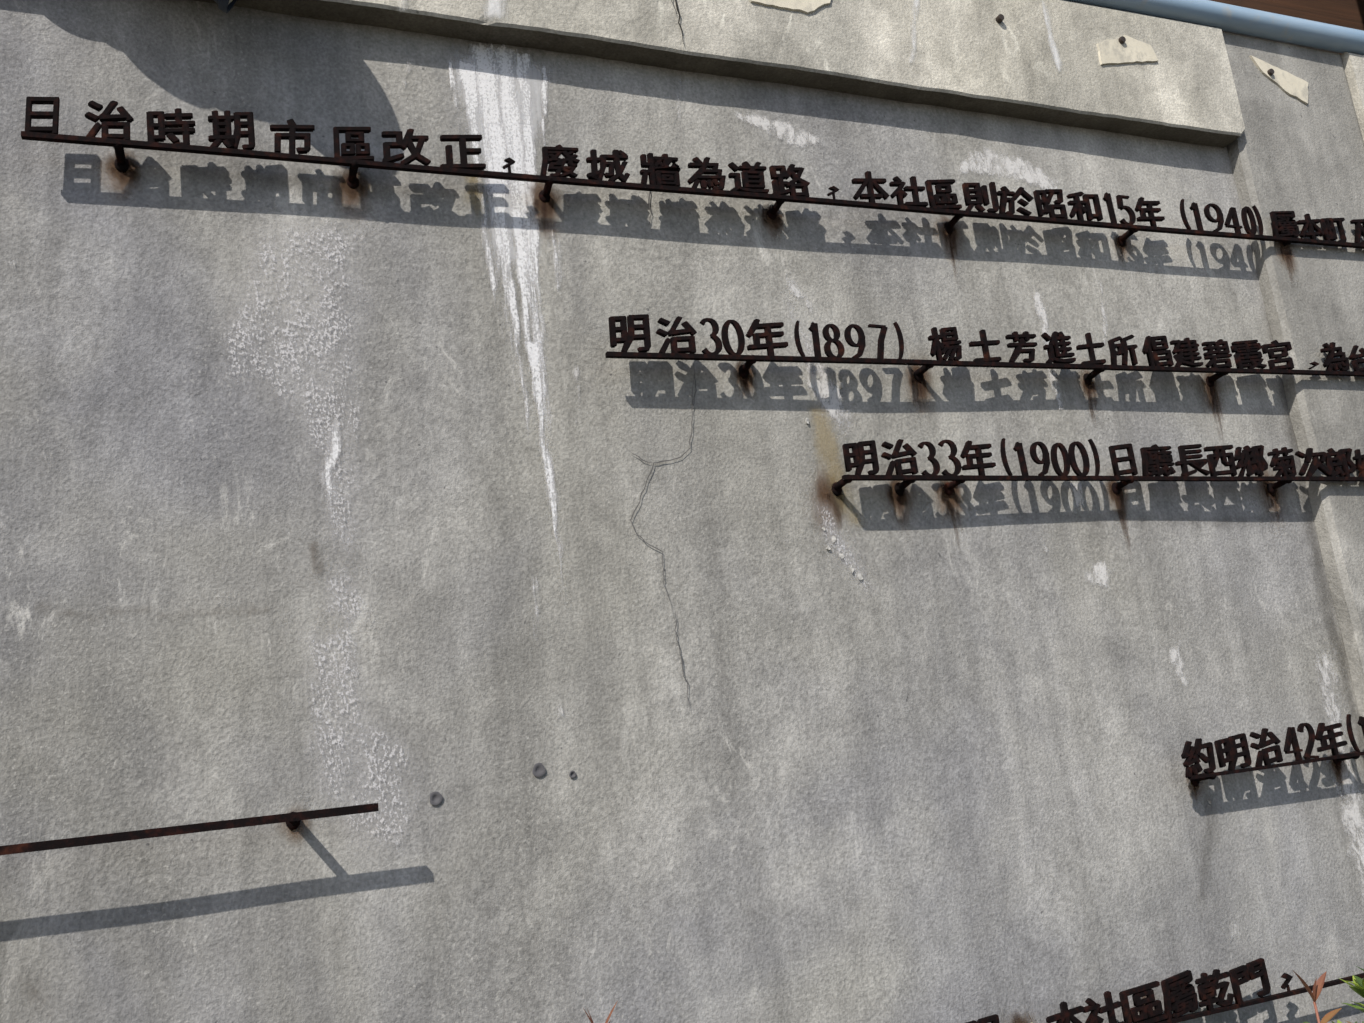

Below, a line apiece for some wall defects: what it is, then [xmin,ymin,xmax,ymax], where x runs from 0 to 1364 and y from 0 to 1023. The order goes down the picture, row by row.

crack [671,0,685,46]
efflorescence [449,43,560,550]
rust [819,480,844,519]
rust [940,481,959,515]
rust [1108,481,1126,531]
crack [629,365,697,707]
damp [1316,654,1364,895]